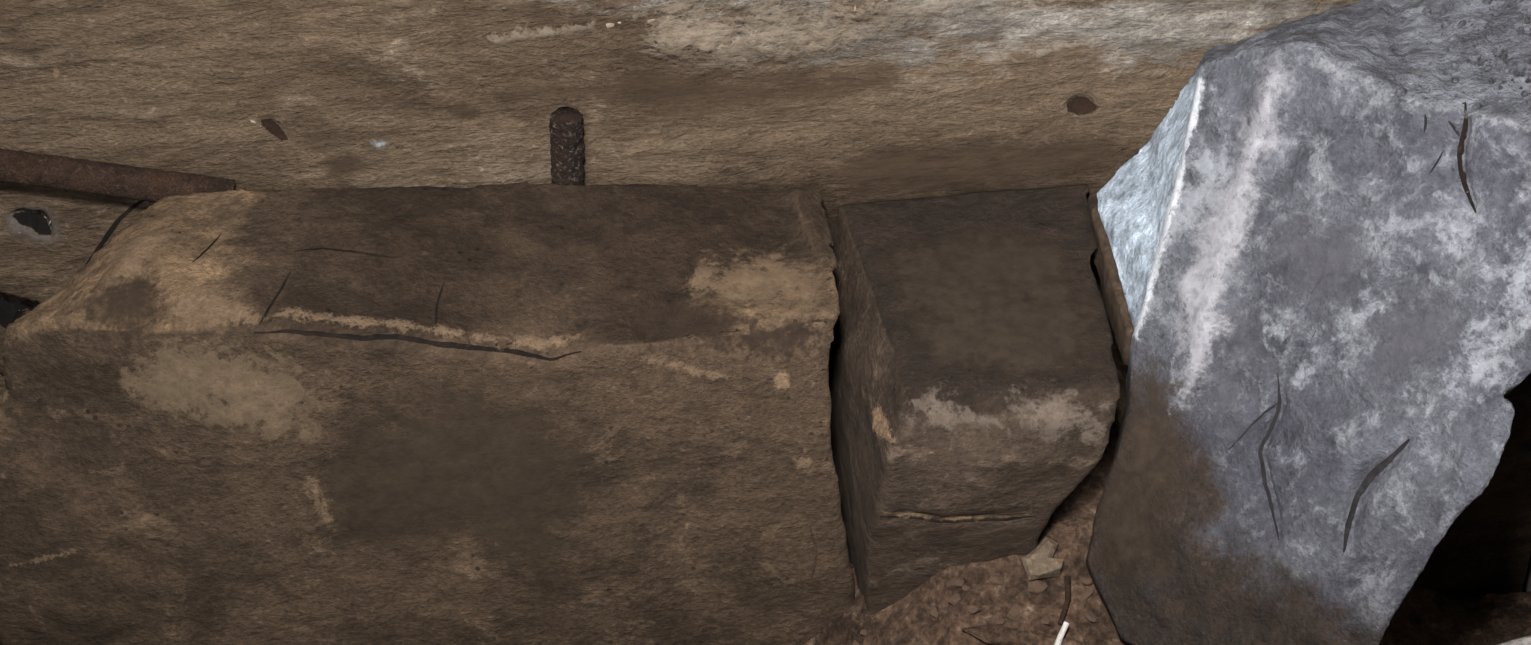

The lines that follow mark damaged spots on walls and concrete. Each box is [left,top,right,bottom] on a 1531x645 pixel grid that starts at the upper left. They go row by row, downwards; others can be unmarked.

crack [1424,102,1477,213]
crack [84,200,144,266]
crack [193,234,221,262]
crack [254,247,581,361]
crack [1228,373,1281,540]
crack [1343,439,1410,552]